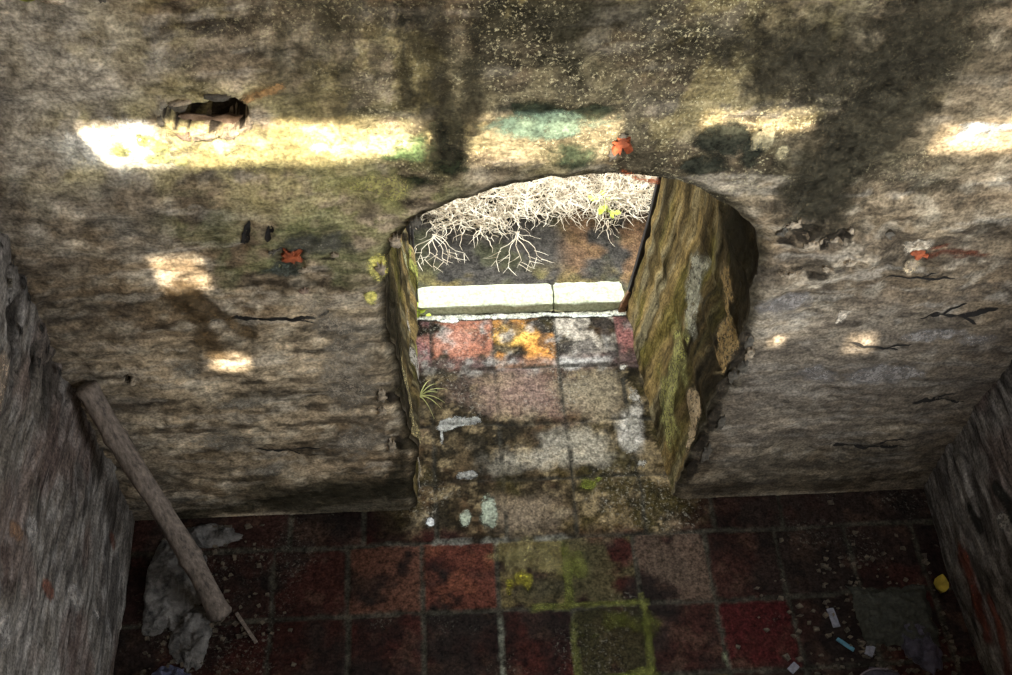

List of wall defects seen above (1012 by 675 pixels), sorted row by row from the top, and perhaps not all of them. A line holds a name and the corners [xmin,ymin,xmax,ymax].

spalling [156,83,284,142]